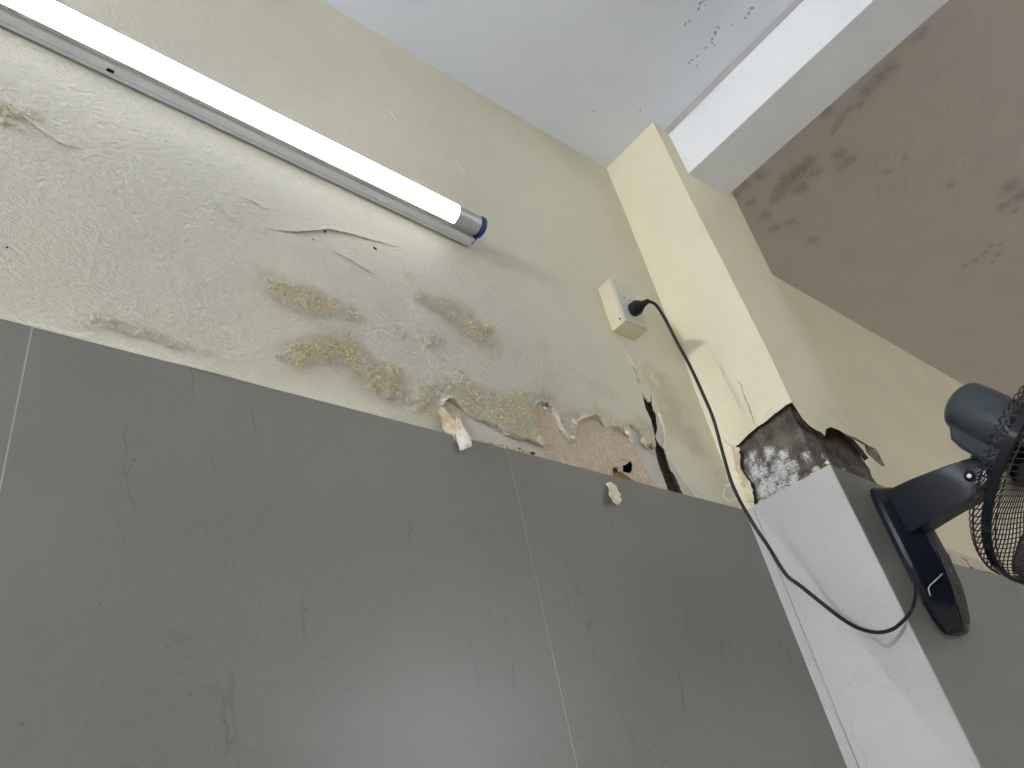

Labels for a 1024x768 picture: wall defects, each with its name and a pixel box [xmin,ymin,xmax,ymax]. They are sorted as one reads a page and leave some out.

peeling [413,366,705,505]
spalling [723,402,885,503]